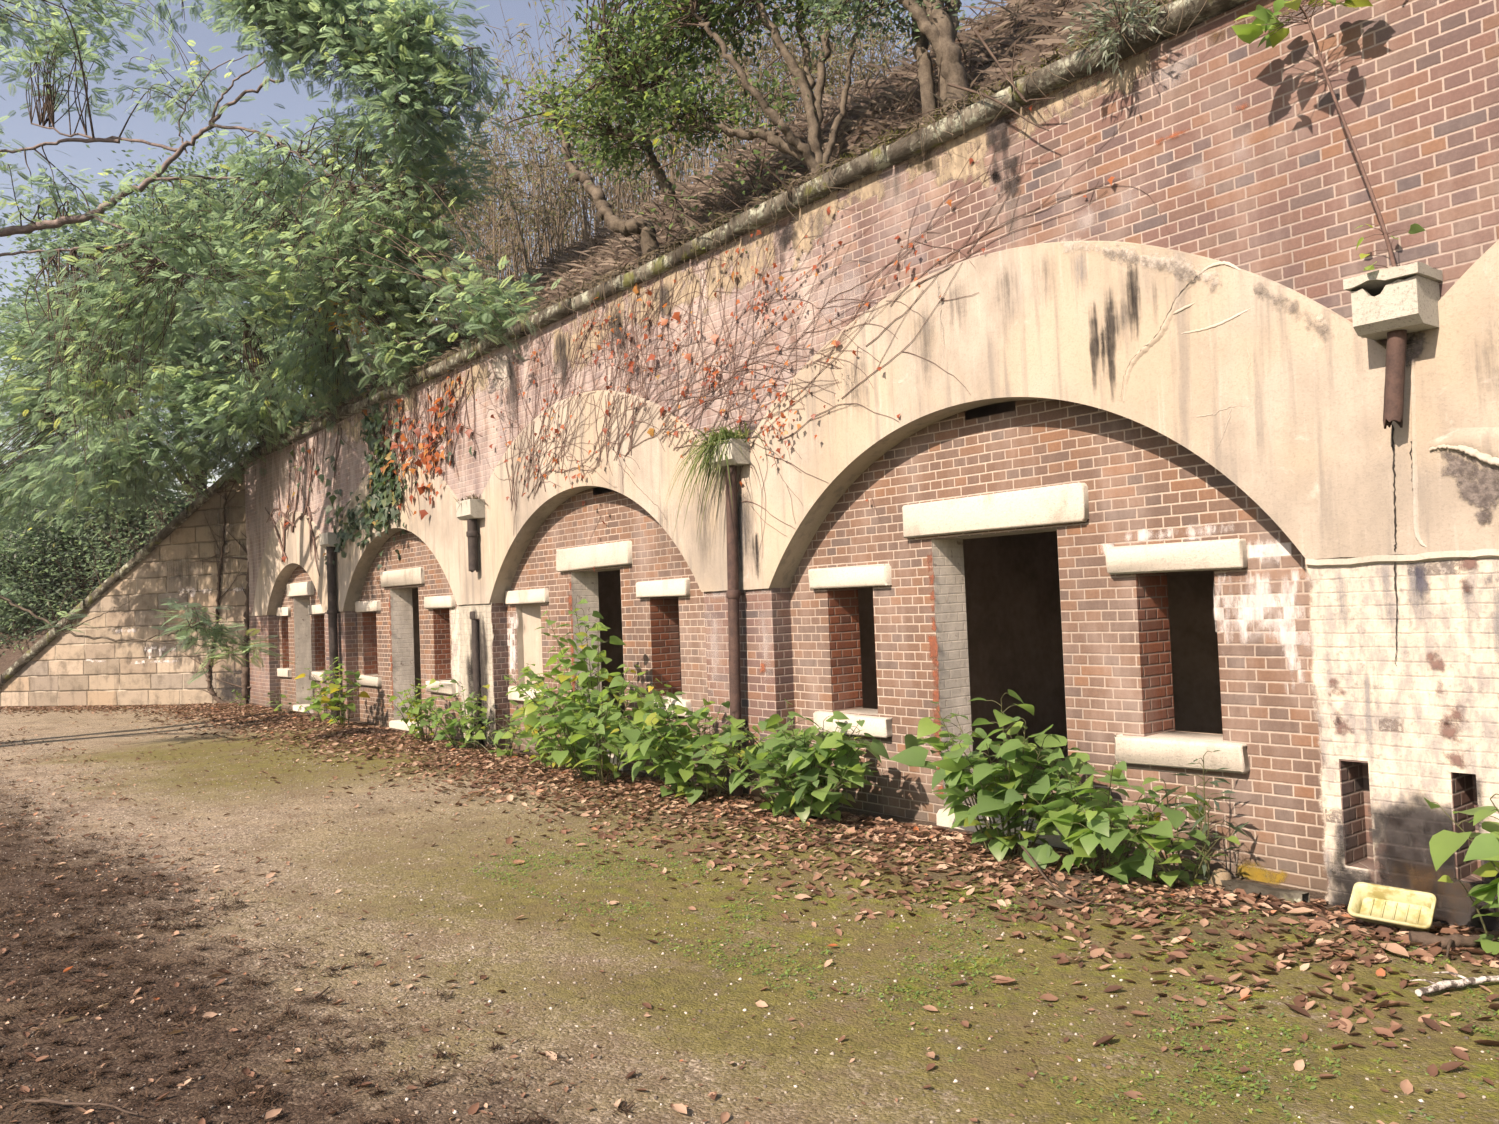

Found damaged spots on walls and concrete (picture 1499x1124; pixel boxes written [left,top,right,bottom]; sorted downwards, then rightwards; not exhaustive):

water stain [986,112,1020,197]
water stain [1090,268,1138,385]
water stain [1103,525,1227,554]
water stain [1214,540,1310,683]
crack [1391,343,1427,666]
water stain [1411,567,1428,603]
flaking render [1441,451,1499,523]
water stain [1328,795,1499,931]